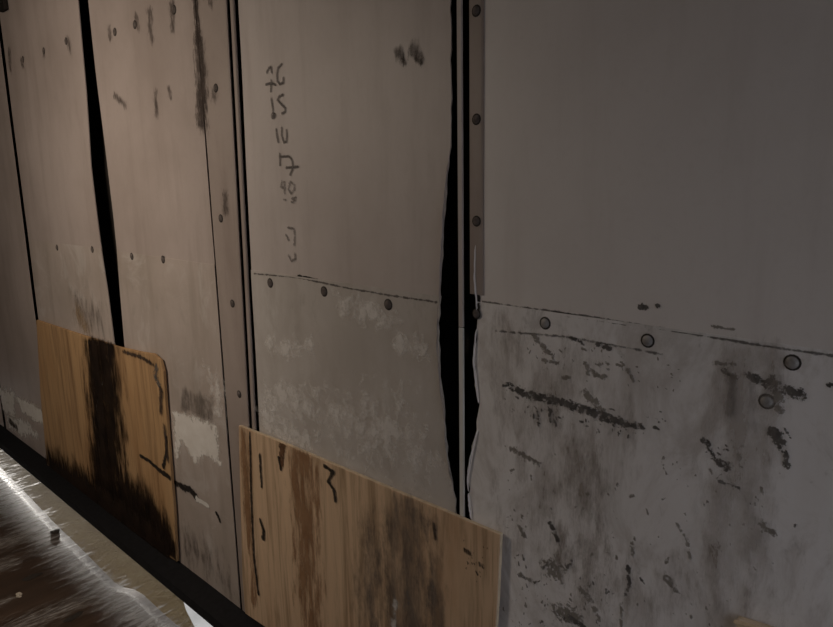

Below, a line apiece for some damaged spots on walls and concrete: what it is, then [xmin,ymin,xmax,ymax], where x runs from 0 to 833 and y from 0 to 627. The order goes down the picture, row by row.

peeling [122,350,163,414]
peeling [163,382,222,466]
leakage [619,542,645,627]